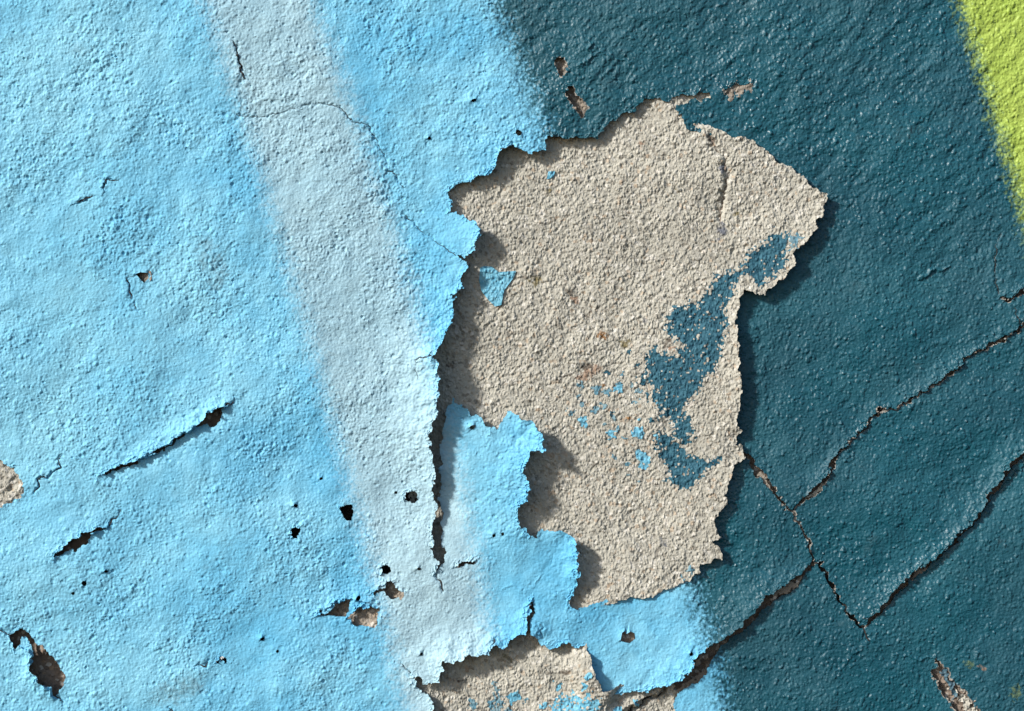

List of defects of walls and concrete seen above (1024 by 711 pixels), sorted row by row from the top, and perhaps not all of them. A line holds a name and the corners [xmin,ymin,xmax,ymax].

peeling [554,57,588,118]
peeling [395,92,828,711]
peeling [103,400,235,475]
peeling [0,460,24,508]
crack [628,233,1024,711]
spalling [54,524,106,557]
peeling [320,581,404,628]
spalling [10,628,66,701]
peeling [931,659,979,711]